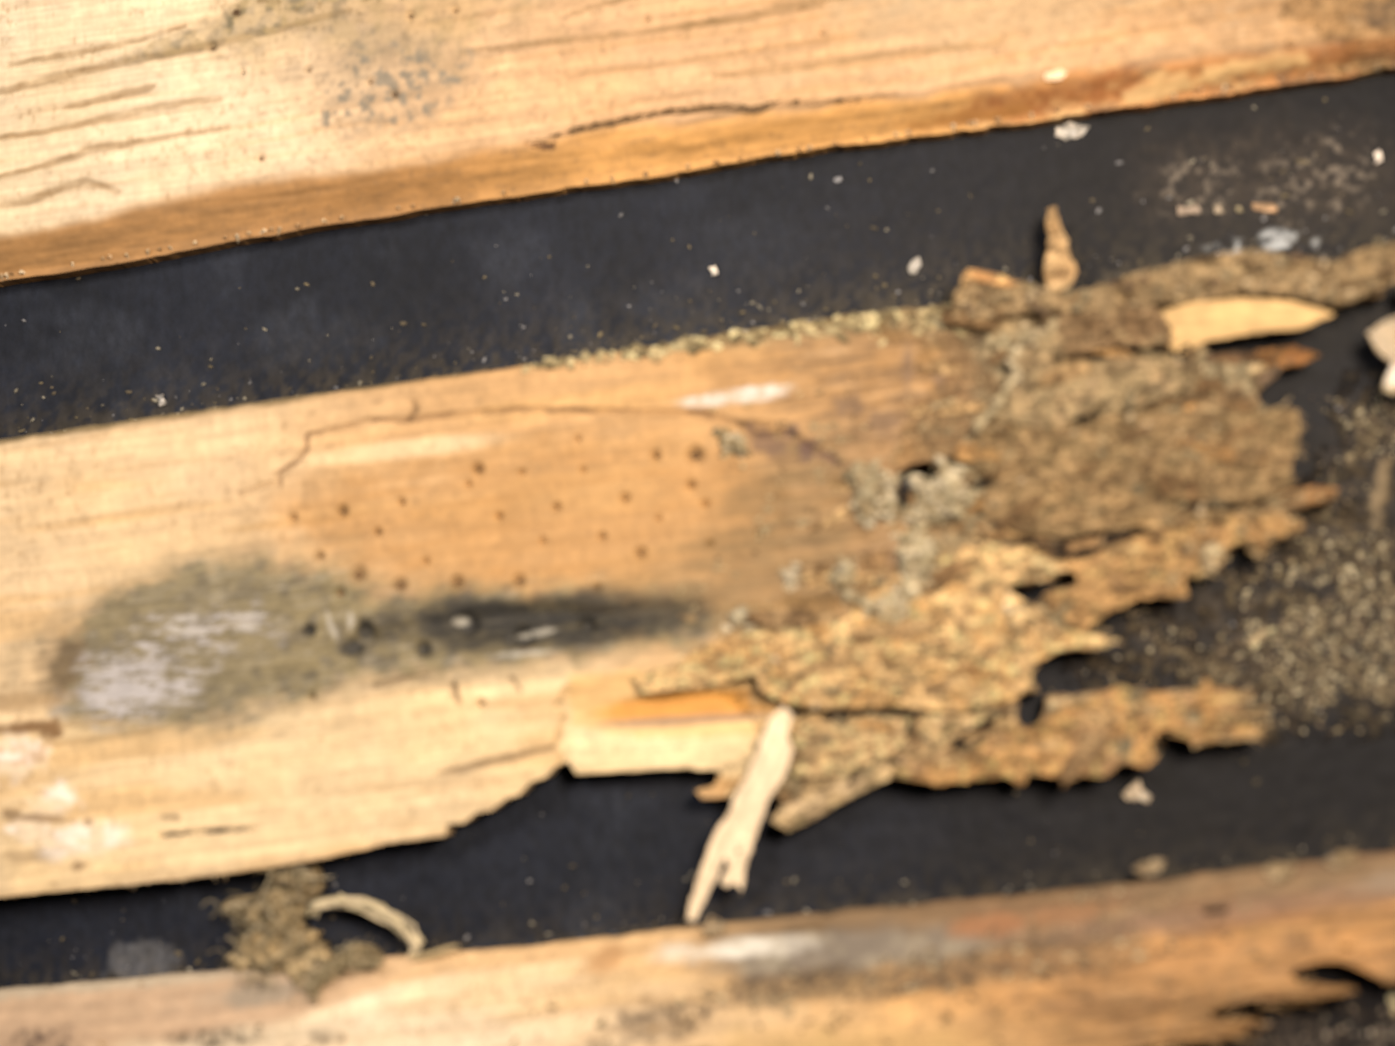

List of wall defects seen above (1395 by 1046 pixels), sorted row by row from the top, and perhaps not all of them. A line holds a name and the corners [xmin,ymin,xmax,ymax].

crack [236,398,734,498]
peeling [563,243,1395,831]
leakage [0,407,874,874]
peeling [1132,859,1165,876]
peeling [1262,862,1295,882]
peeling [1324,850,1360,869]